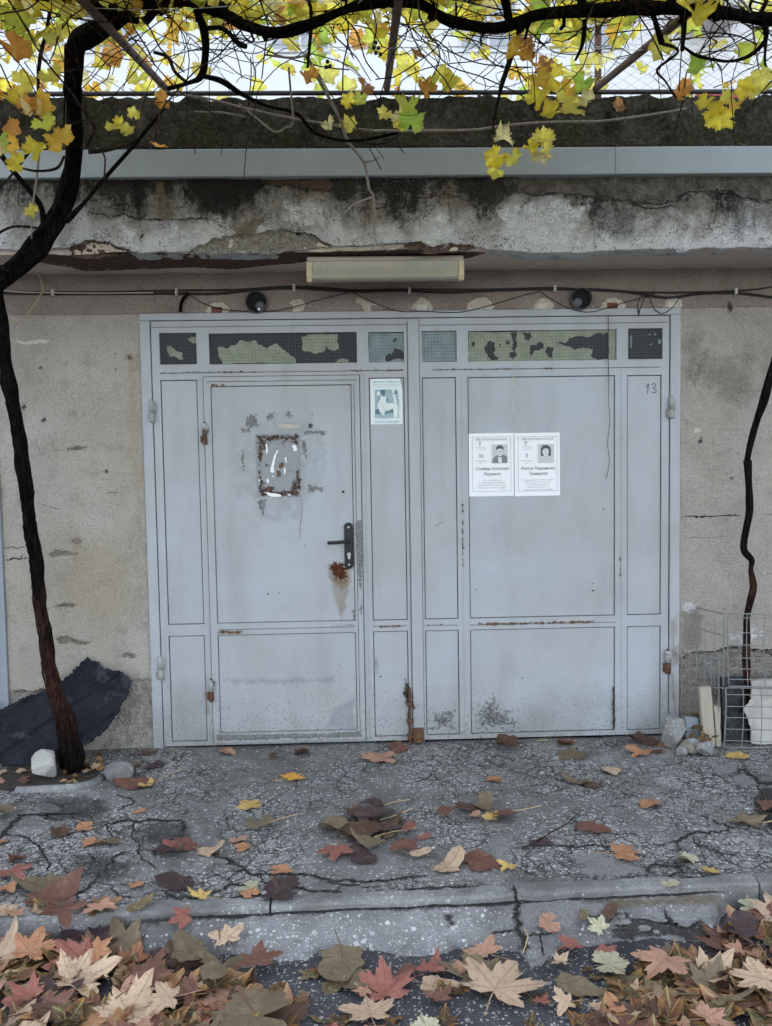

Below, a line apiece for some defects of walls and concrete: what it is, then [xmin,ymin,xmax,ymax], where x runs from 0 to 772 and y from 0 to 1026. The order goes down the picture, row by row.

water stain [186,179,263,220]
water stain [283,201,326,227]
water stain [332,178,355,202]
crack [500,188,772,222]
peeling [41,207,485,271]
peeling [167,346,183,360]
peeling [217,334,348,364]
peeling [422,330,616,362]
corrosion [329,520,363,626]
flaking render [679,645,772,740]
crack [140,887,727,956]